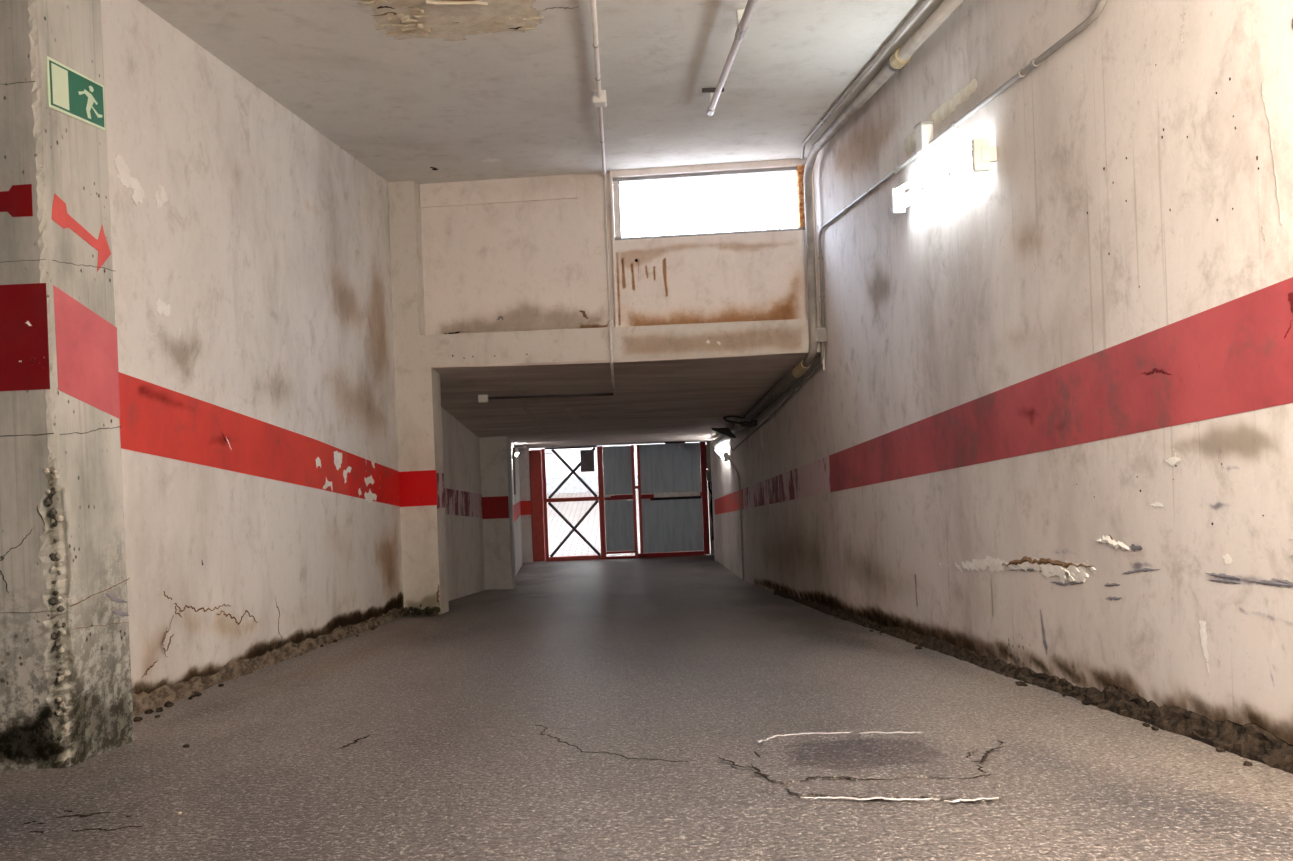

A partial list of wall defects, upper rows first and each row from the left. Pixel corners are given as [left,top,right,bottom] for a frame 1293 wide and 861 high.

peeling [356,0,546,41]
peeling [316,450,377,503]
crack [0,505,45,593]
spalling [939,554,1096,586]
damp [234,593,403,662]
damp [755,580,1139,696]
damp [132,665,220,694]
spalling [773,589,1293,774]
crack [536,725,678,762]
damp [1165,700,1293,746]